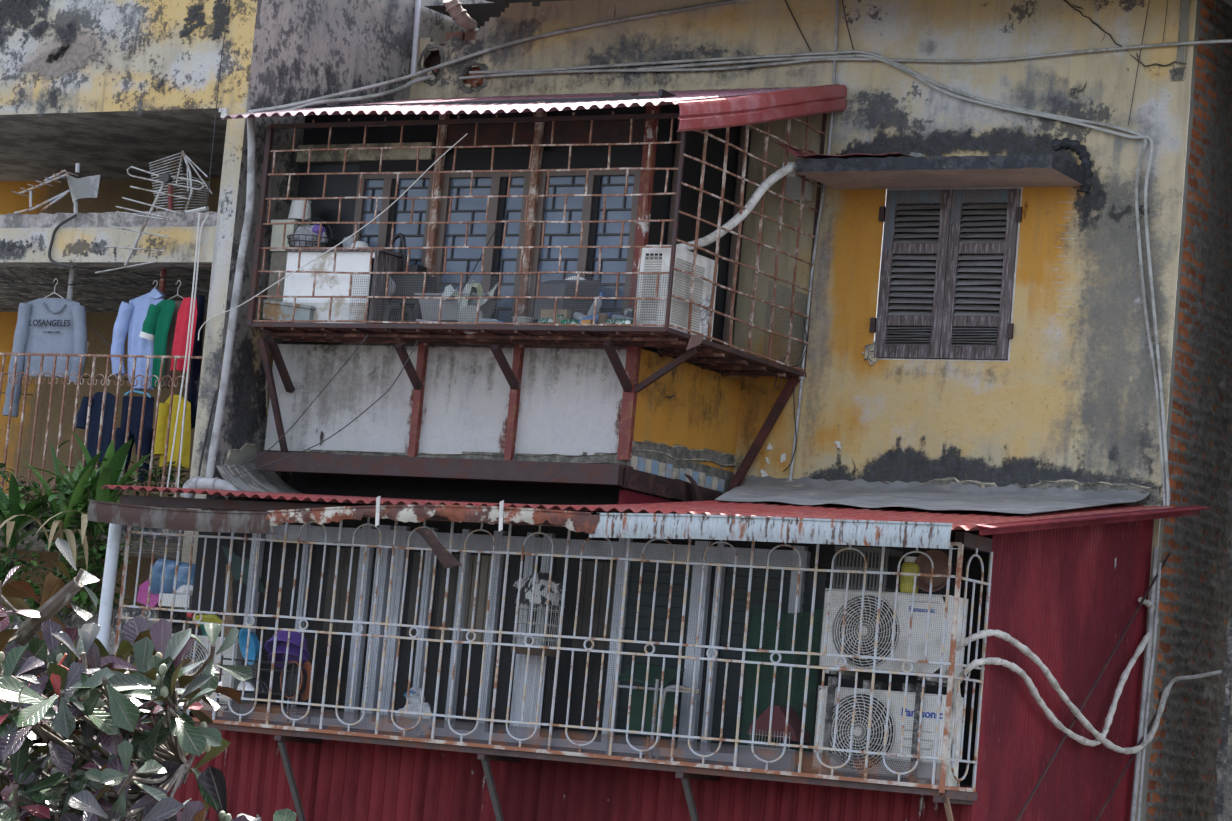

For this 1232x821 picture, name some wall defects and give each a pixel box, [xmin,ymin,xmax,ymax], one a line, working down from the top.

water stain [0,0,147,63]
water stain [179,0,231,40]
crack [1063,0,1186,79]
water stain [251,57,410,112]
water stain [837,90,1077,164]
water stain [809,160,1170,491]